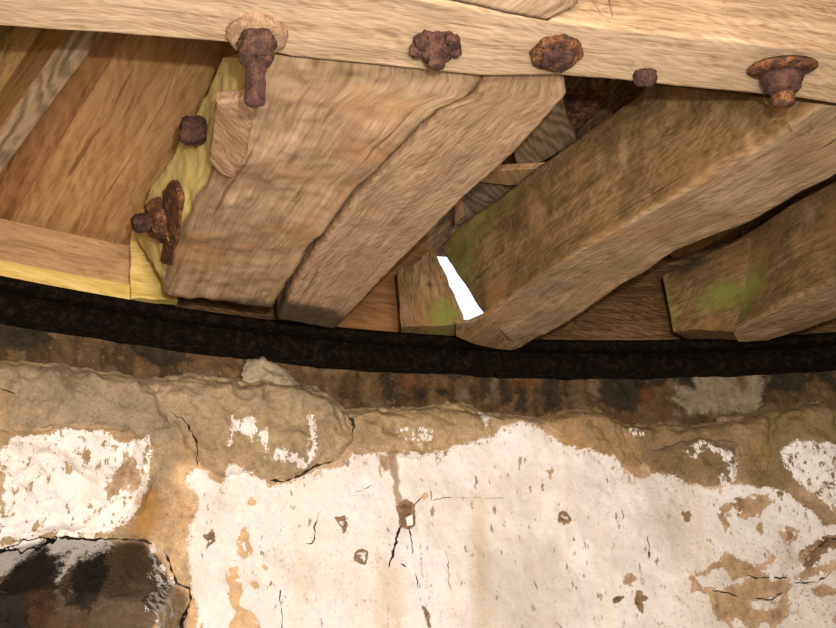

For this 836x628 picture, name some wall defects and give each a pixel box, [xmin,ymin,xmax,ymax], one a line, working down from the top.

leakage [133,345,194,366]
leakage [499,378,528,413]
leakage [541,378,570,411]
leakage [598,378,664,413]
leakage [673,375,766,415]
spalling [630,462,651,479]
peeling [717,493,773,536]
spalling [203,529,216,550]
crack [387,525,418,586]
peeling [226,526,262,628]
peeling [684,525,836,628]